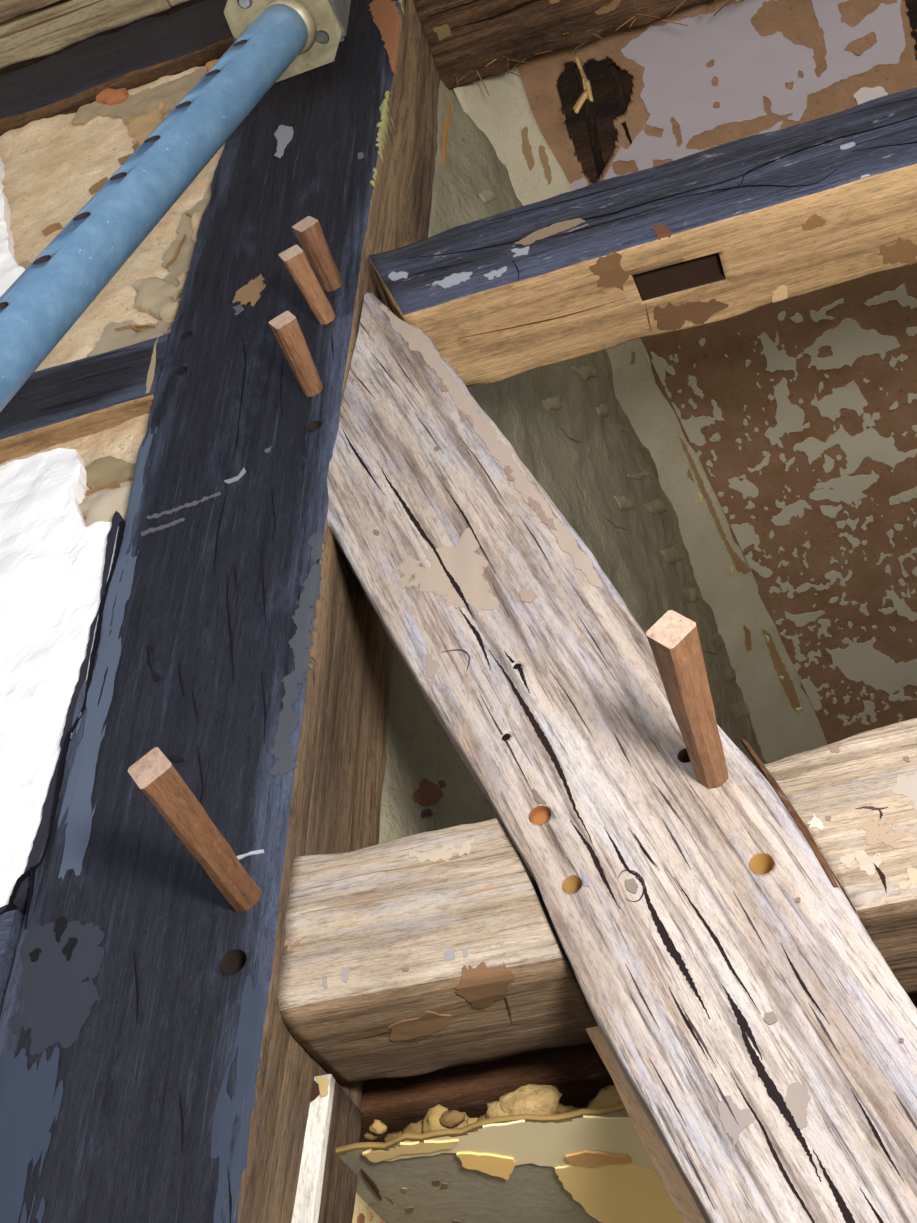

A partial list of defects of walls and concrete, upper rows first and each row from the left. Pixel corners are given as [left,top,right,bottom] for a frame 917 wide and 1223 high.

peeling [604,0,906,180]
peeling [521,127,552,185]
peeling [570,177,588,190]
spalling [637,445,659,478]
peeling [679,437,751,575]
spalling [269,531,326,776]
peeling [743,625,802,712]
crack [340,425,888,1223]
hole [54,916,78,961]
crack [850,1088,904,1181]
crack [894,1092,917,1130]
peeling [357,1212,384,1223]